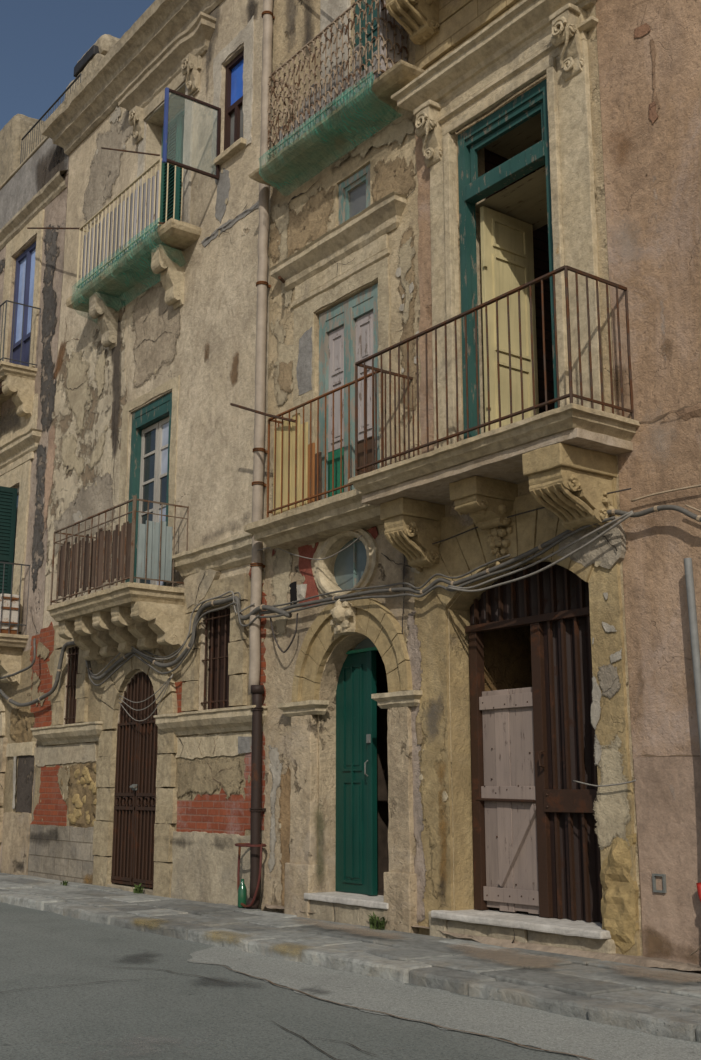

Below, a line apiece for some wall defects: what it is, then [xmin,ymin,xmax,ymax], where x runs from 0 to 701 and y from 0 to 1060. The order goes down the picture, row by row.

flaking render [82,106,133,228]
flaking render [396,226,419,411]
peeling [33,292,127,576]
crack [639,402,701,423]
spalling [9,622,100,828]
flaking render [175,731,283,872]
spalling [591,649,640,954]